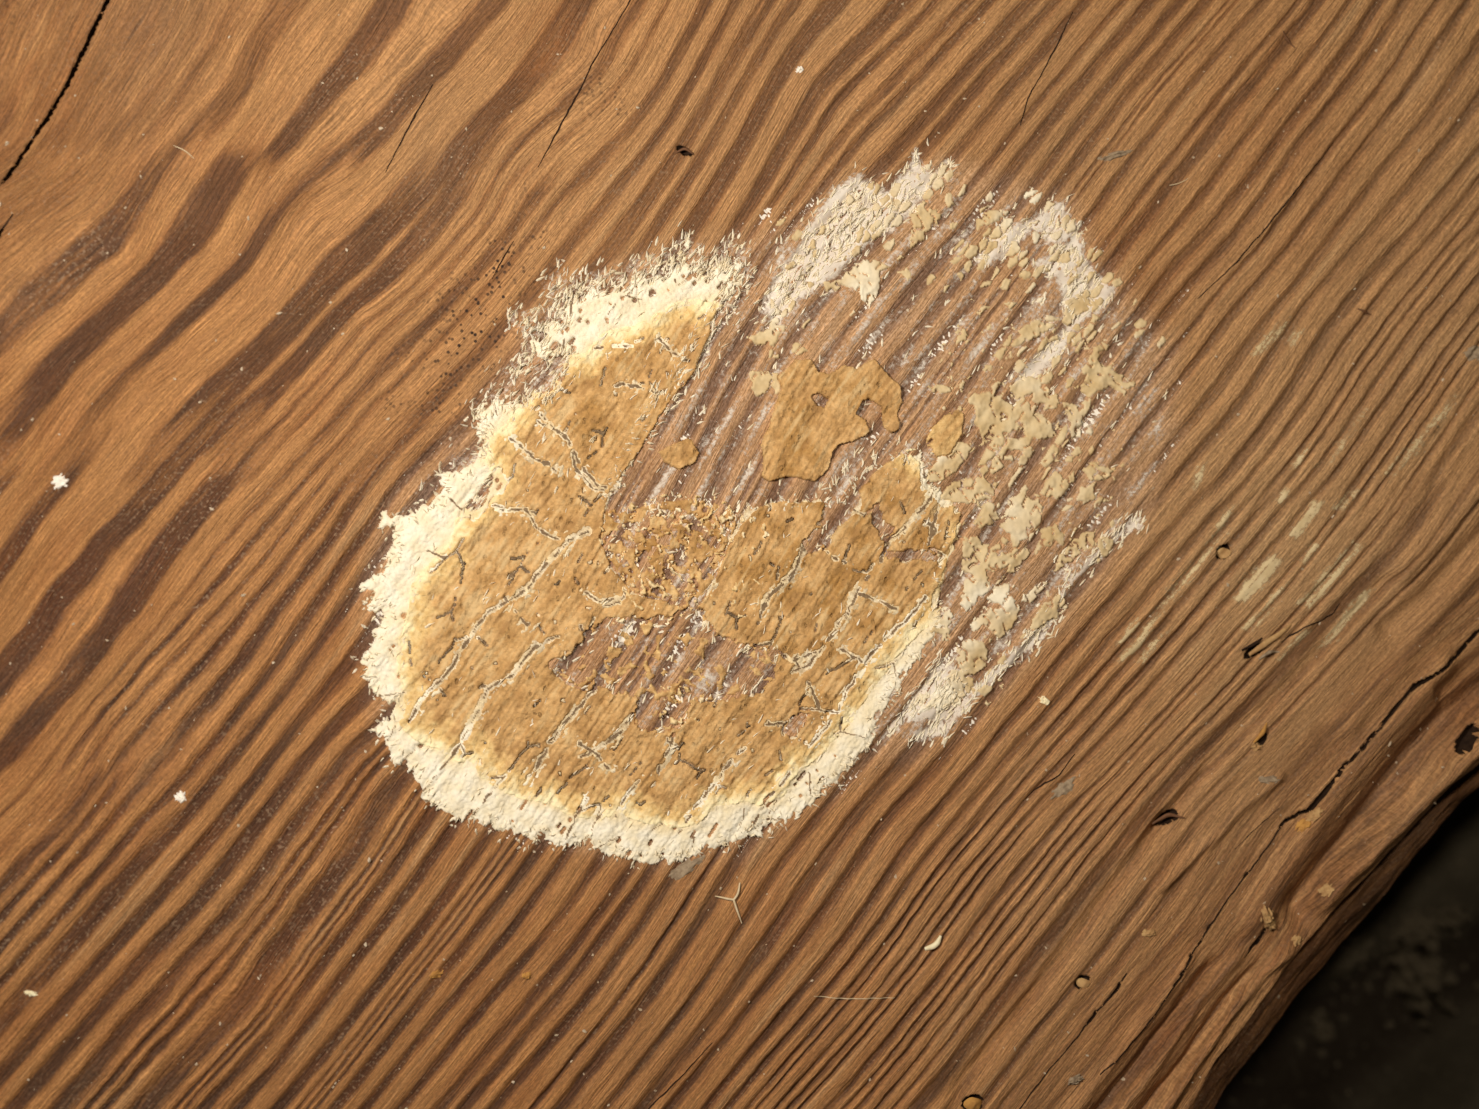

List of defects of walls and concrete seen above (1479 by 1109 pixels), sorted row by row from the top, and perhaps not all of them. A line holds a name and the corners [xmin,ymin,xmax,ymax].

crack [0,0,110,235]
crack [1281,603,1340,643]
crack [1023,754,1075,801]
crack [1100,629,1479,1075]
crack [1019,973,1127,1109]